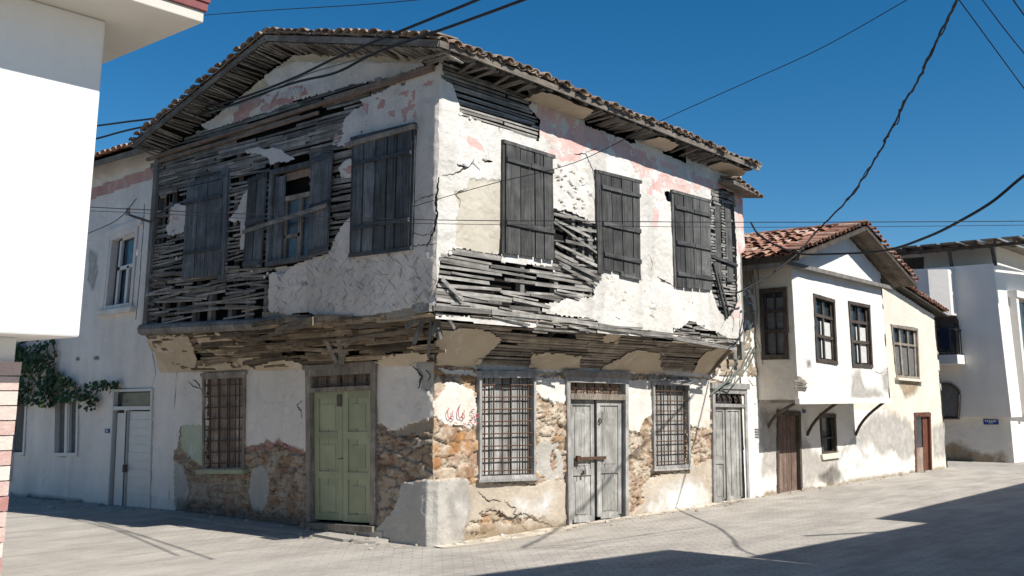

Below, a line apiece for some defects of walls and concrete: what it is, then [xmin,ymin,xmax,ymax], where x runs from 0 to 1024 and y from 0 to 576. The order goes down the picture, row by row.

peeling [233,53,423,124]
peeling [362,64,453,123]
crack [415,159,480,247]
peeling [467,135,493,163]
peeling [533,102,745,254]
peeling [339,286,426,325]
flaking render [173,362,306,523]
flaking render [375,353,567,527]
flaking render [629,373,729,516]
water stain [802,414,915,489]
crack [478,491,549,527]